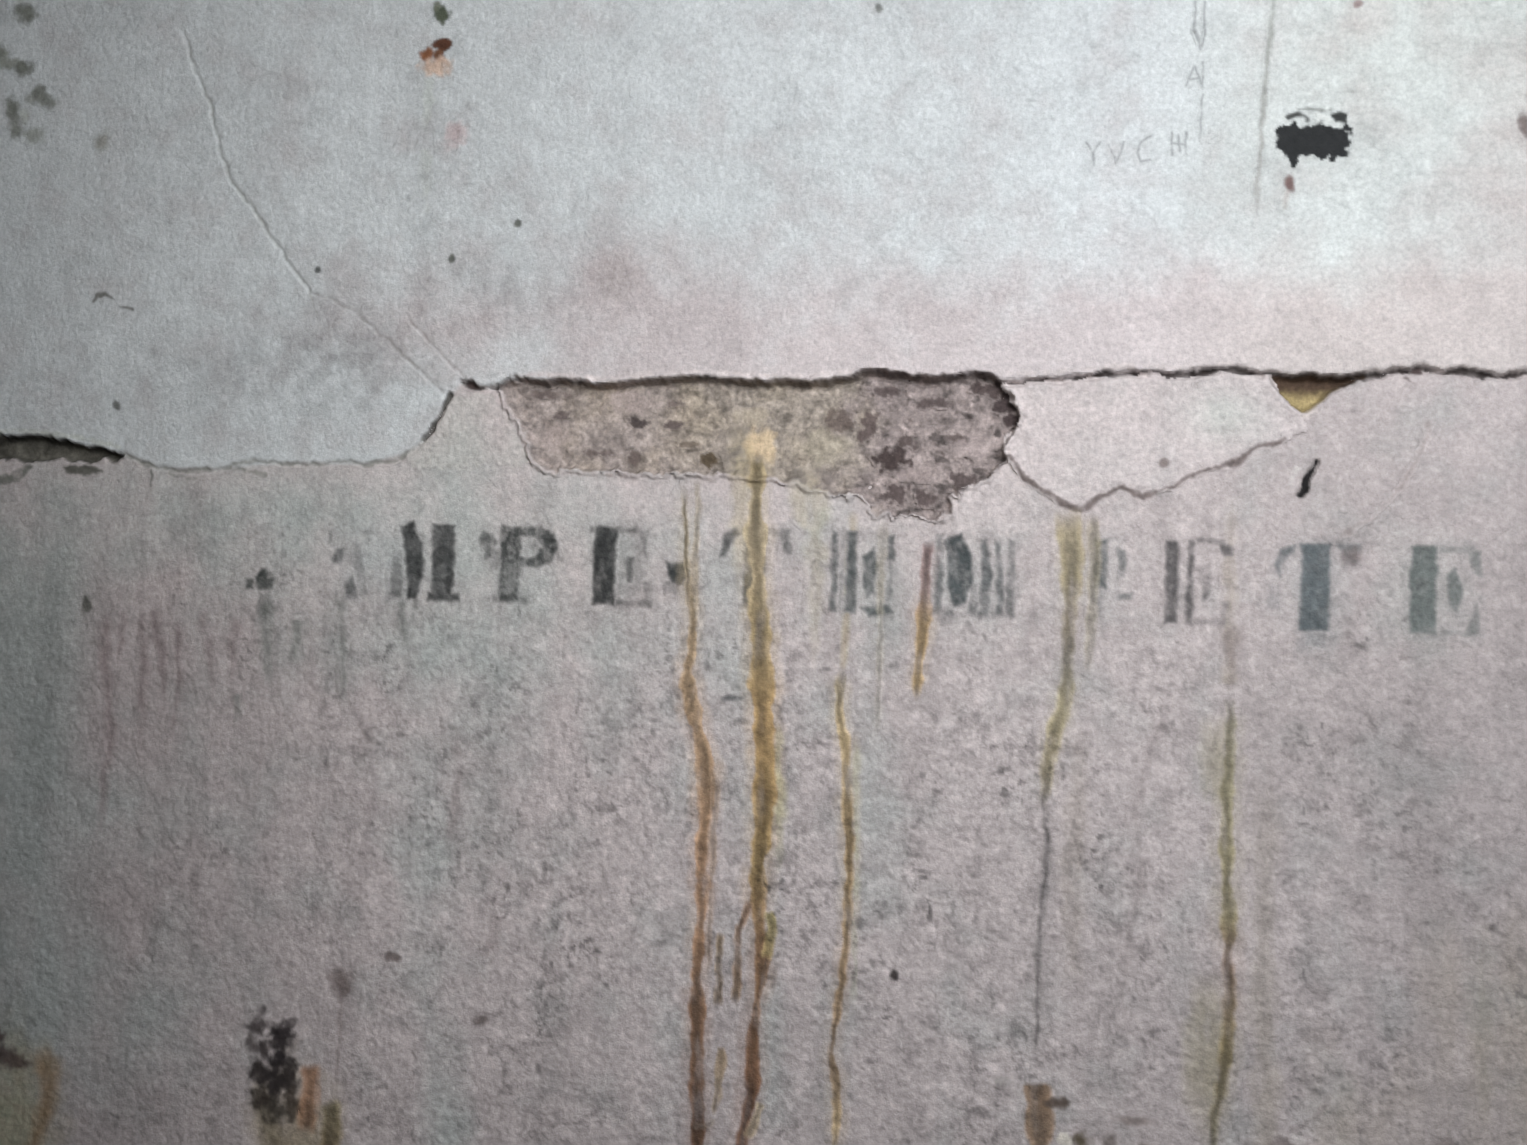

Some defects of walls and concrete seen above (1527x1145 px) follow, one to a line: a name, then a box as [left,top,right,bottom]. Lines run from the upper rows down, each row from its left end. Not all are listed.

flaking render [0,426,127,487]
crack [91,289,136,313]
crack [122,42,511,487]
flaking render [406,366,1368,523]
crack [946,358,1527,384]
rust [668,423,945,1145]
damp [1289,878,1527,1145]